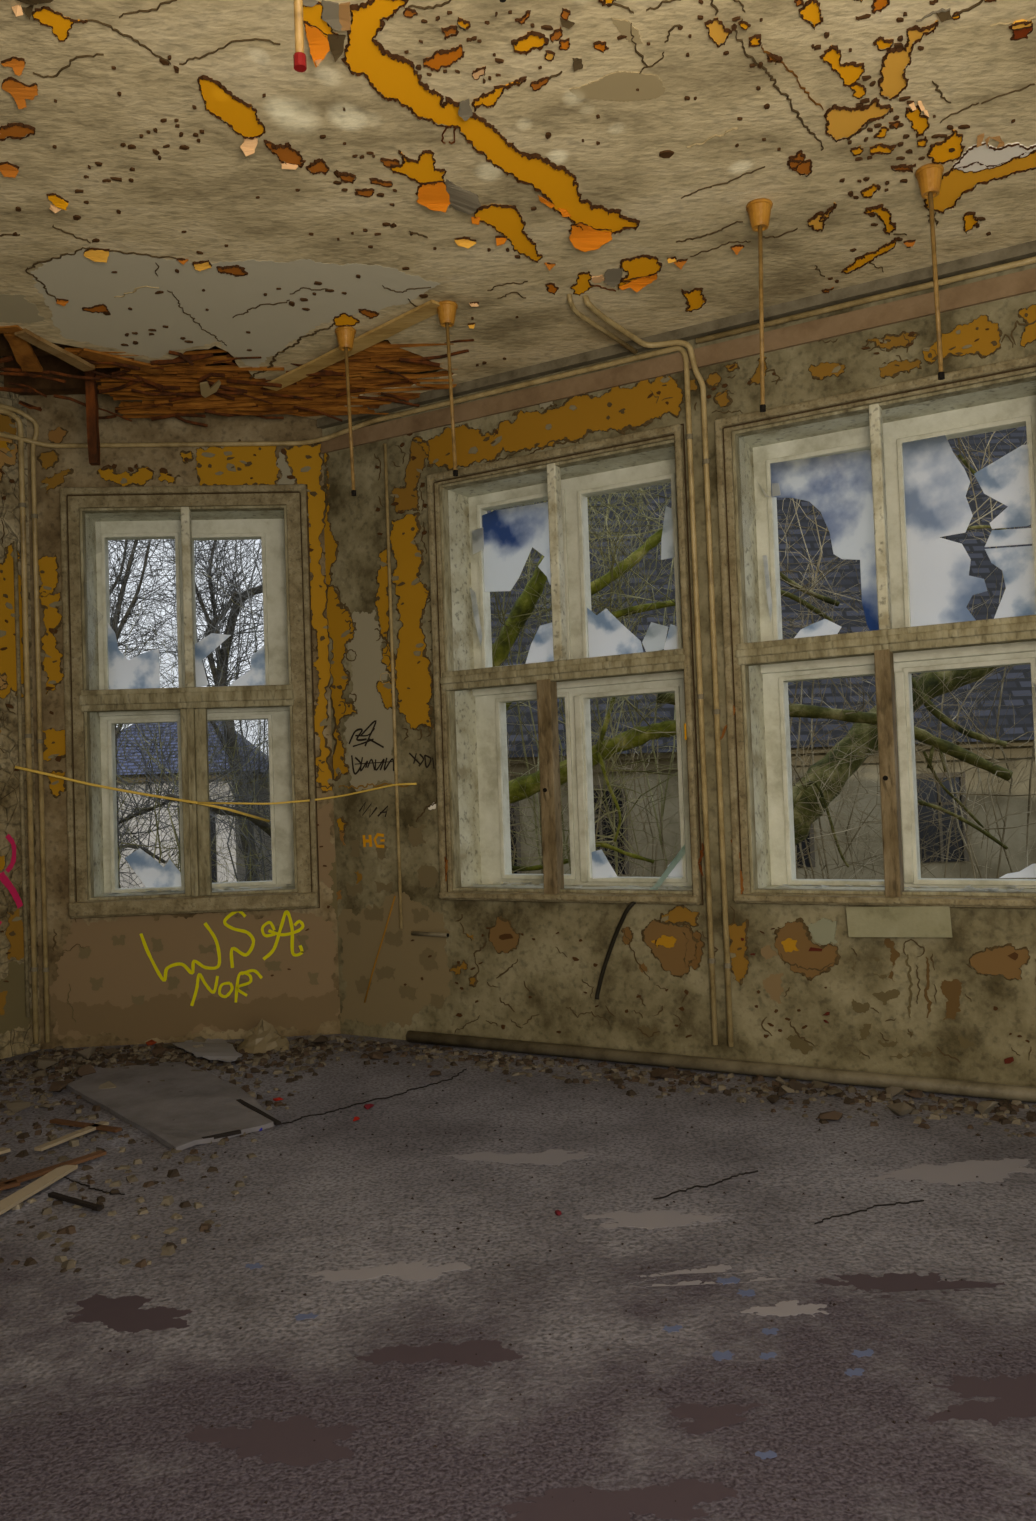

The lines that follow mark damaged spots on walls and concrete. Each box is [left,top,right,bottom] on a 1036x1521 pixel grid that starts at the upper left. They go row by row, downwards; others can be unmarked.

peeling [0,56,38,141]
crack [33,0,280,78]
peeling [197,0,688,296]
crack [607,0,885,151]
peeling [820,10,1036,234]
crack [916,0,1036,27]
crack [932,80,1035,123]
peeling [821,183,916,293]
crack [0,225,335,379]
peeling [97,356,780,793]
leakage [63,1293,192,1334]
leakage [490,1479,739,1521]